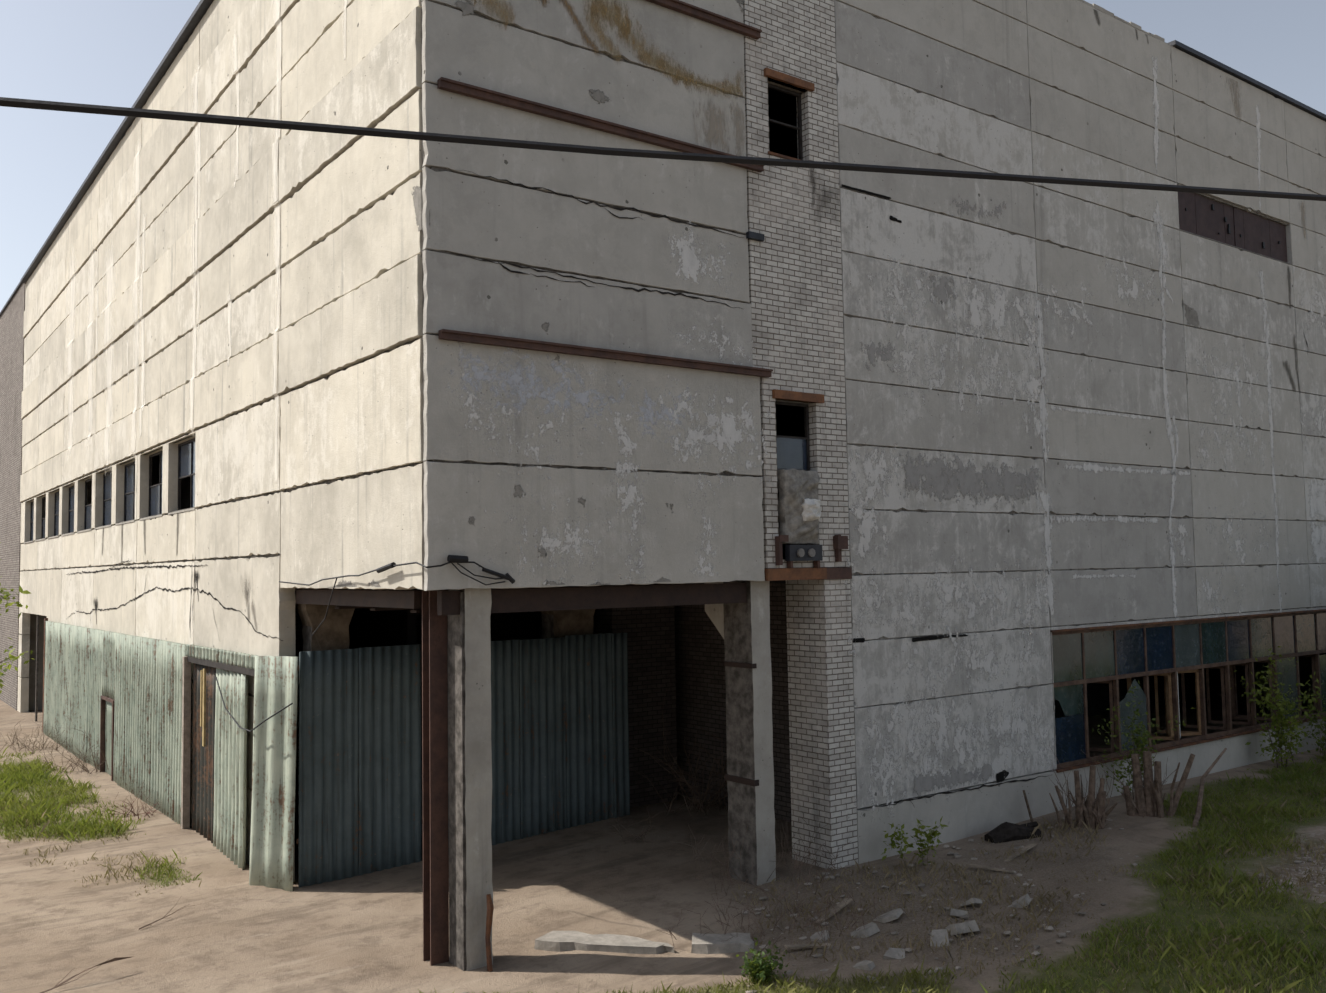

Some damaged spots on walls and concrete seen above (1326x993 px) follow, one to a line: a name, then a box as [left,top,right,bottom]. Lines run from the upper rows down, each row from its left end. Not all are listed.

rust [542,0,740,94]
crack [465,170,744,238]
spalling [842,184,891,199]
crack [452,252,742,309]
peeling [459,366,671,585]
peeling [656,374,772,577]
peeling [898,452,1042,508]
damp [1034,203,1190,618]
damp [1258,270,1300,612]
crack [66,558,283,641]
spalling [912,634,968,642]
peeling [913,763,1009,797]